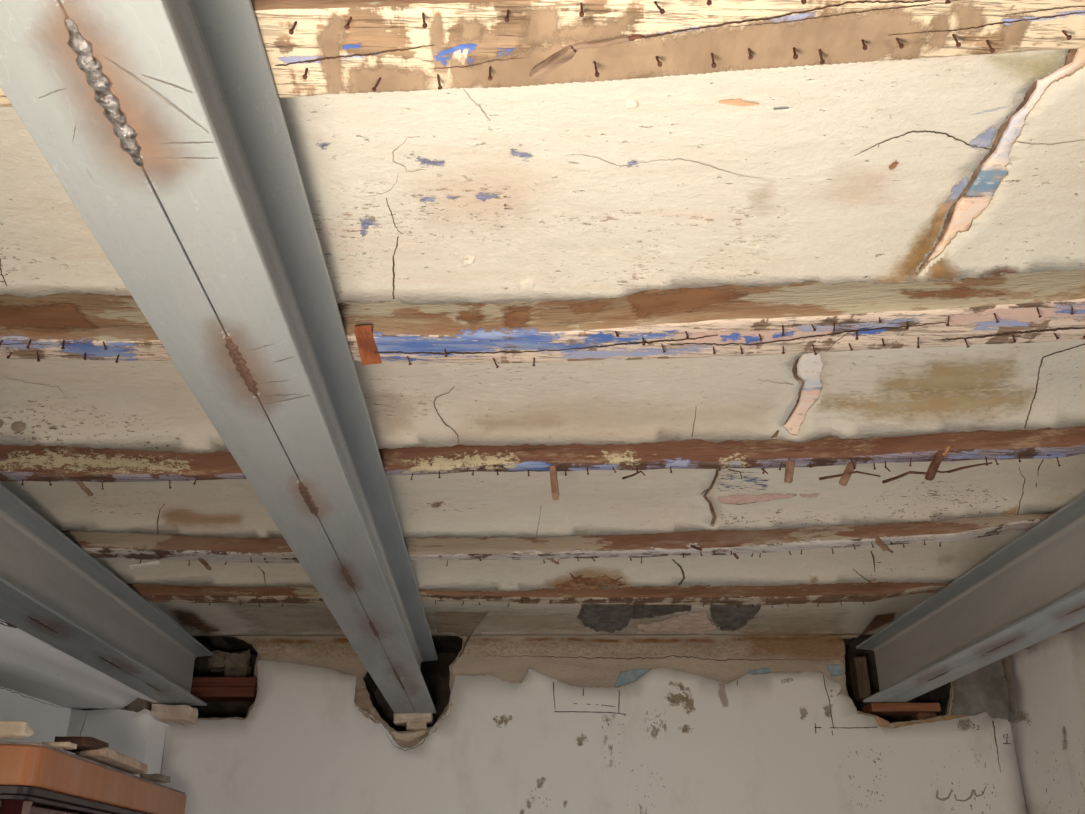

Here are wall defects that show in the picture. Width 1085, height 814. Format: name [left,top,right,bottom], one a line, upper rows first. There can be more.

crack [565,154,767,181]
crack [855,49,1085,270]
crack [366,136,423,299]
damp [888,230,954,281]
crack [433,386,459,443]
crack [1024,344,1085,429]
flaking render [172,610,219,634]
flaking render [197,611,895,751]
flaking render [857,680,975,729]